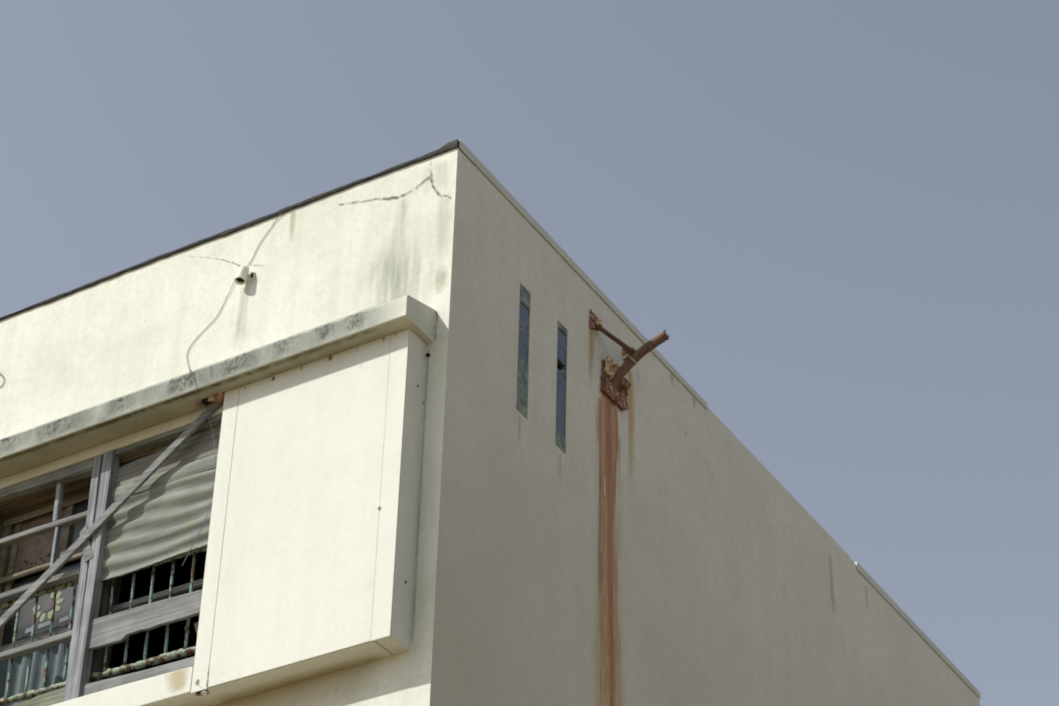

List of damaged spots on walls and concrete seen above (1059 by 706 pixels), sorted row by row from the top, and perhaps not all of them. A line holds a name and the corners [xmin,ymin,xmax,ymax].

crack [338,161,451,205]
leakage [0,309,368,461]
rust [597,371,632,706]